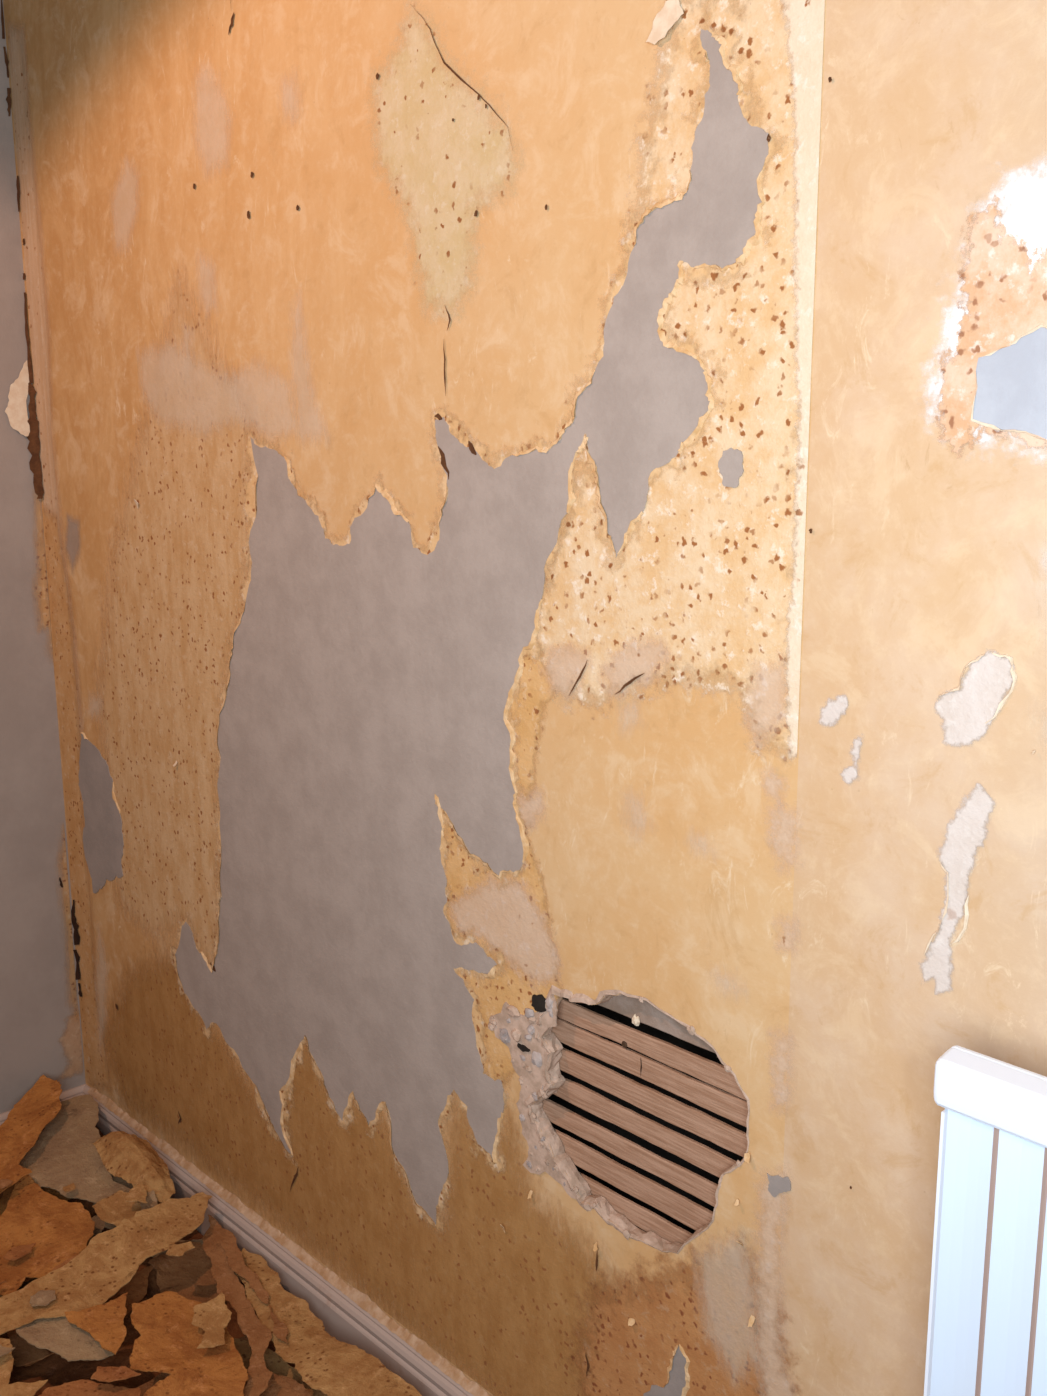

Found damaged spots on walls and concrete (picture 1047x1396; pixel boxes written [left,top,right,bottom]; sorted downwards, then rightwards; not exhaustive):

crack [412,6,513,149]
peeling [646,0,684,45]
flaking render [927,163,1047,459]
peeling [5,361,30,436]
peeling [170,12,784,1254]
peeling [819,695,848,726]
peeling [935,651,1017,746]
peeling [920,783,995,994]